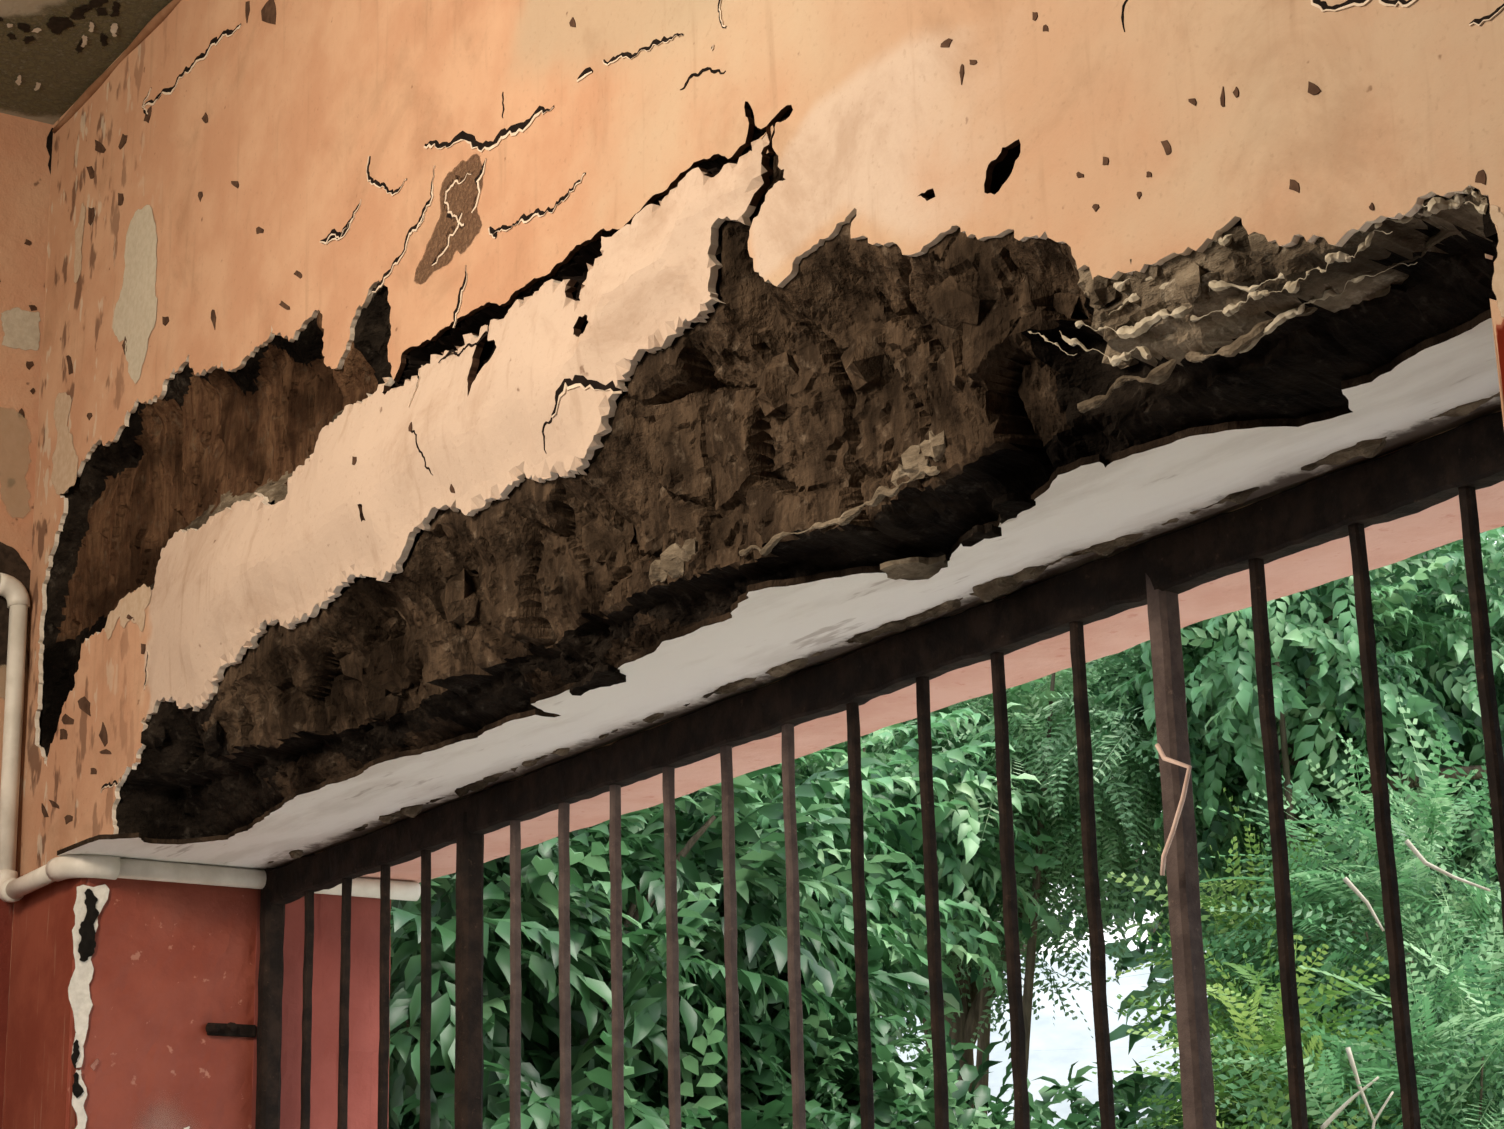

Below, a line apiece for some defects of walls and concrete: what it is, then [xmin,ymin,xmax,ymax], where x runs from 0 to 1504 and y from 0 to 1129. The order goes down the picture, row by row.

peeling [0,0,121,54]
peeling [245,0,276,25]
crack [1120,0,1128,32]
crack [1311,0,1418,12]
crack [1469,3,1504,26]
peeling [1220,87,1239,107]
crack [654,104,793,206]
spalling [990,143,1021,194]
crack [320,0,726,475]
spalling [112,152,1504,840]
spalling [0,285,407,774]
peeling [68,884,109,1129]